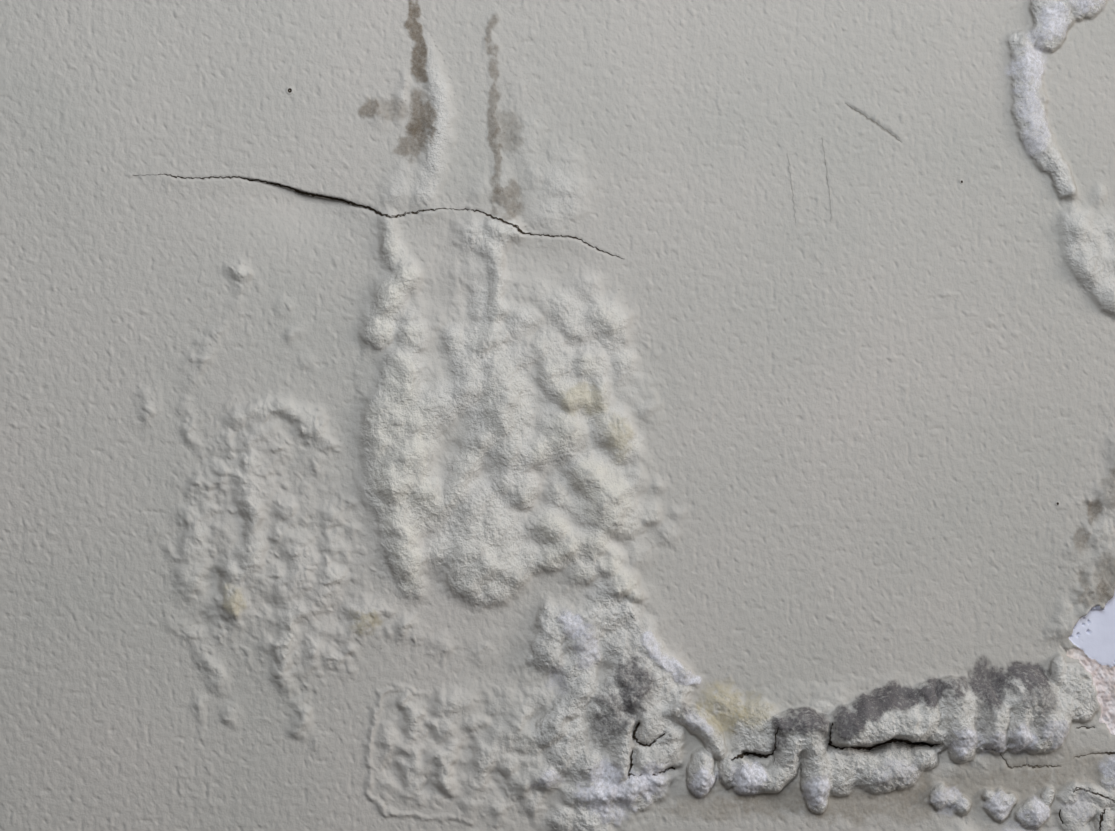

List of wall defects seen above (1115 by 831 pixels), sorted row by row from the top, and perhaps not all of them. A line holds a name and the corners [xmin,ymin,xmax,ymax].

crack [134,174,623,259]
peeling [1044,431,1115,735]
crack [731,727,779,761]
crack [828,723,940,750]